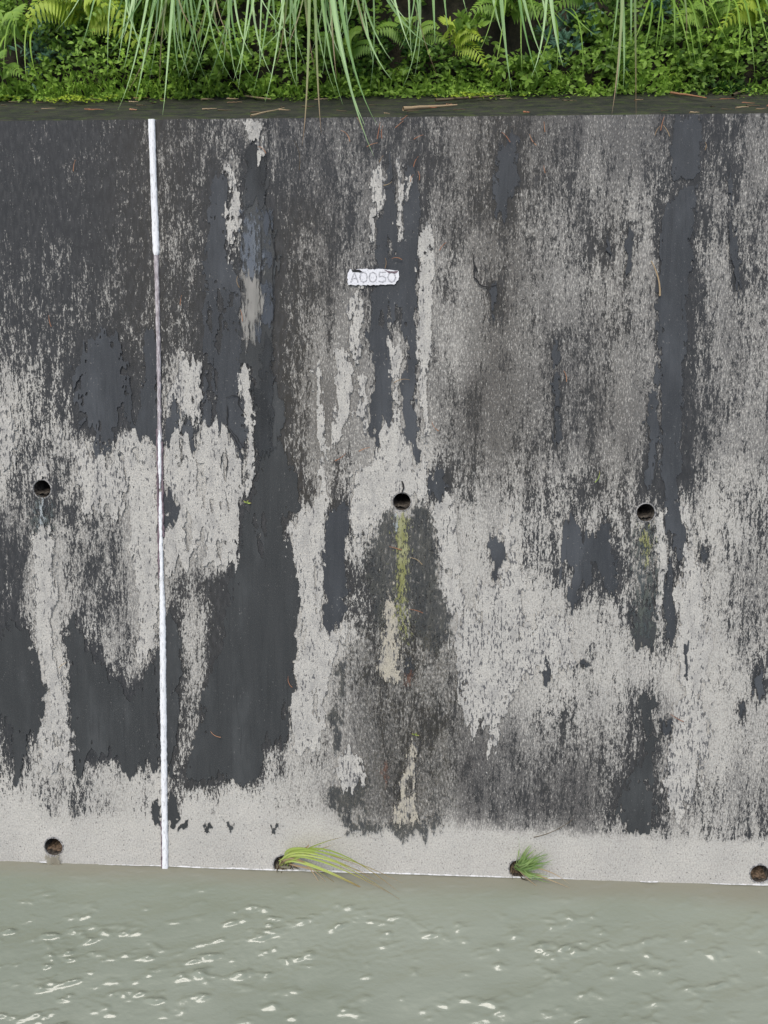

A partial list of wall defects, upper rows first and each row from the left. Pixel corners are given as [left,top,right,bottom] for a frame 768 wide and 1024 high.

leakage [323,498,469,844]
leakage [624,519,676,648]